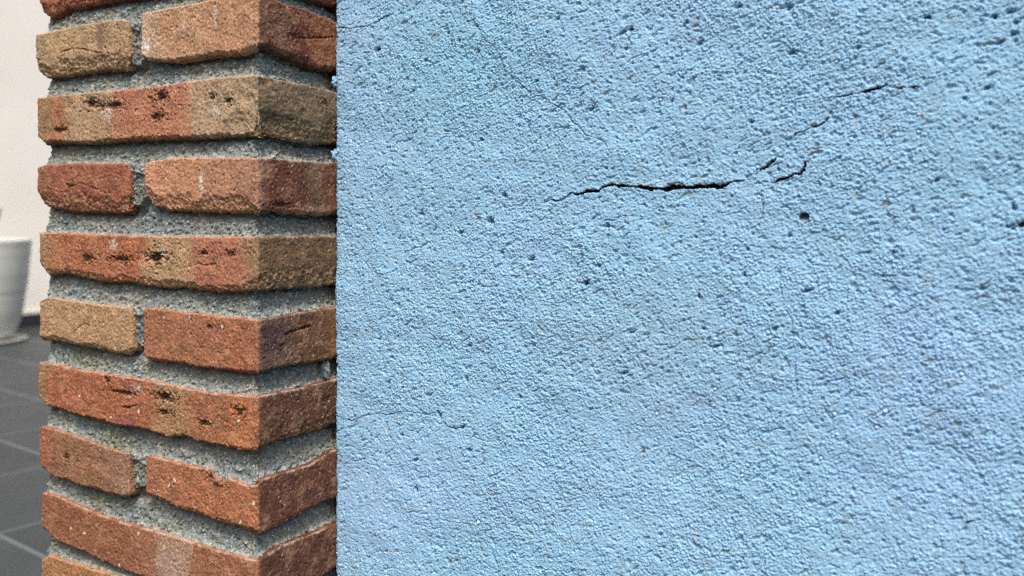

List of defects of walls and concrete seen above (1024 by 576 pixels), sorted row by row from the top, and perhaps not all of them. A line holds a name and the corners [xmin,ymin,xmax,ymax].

crack [840,86,916,97]
crack [555,160,806,201]